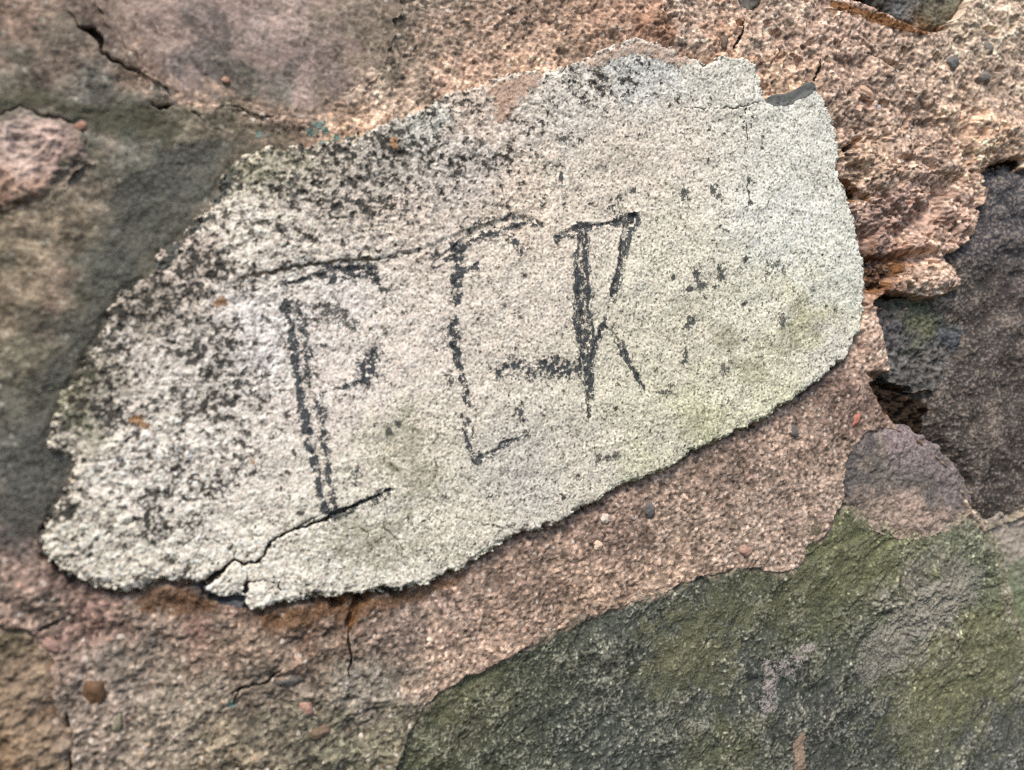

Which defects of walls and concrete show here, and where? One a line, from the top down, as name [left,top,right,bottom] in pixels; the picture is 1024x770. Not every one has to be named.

crack [67,12,274,130]
crack [202,489,401,593]
crack [344,598,358,677]